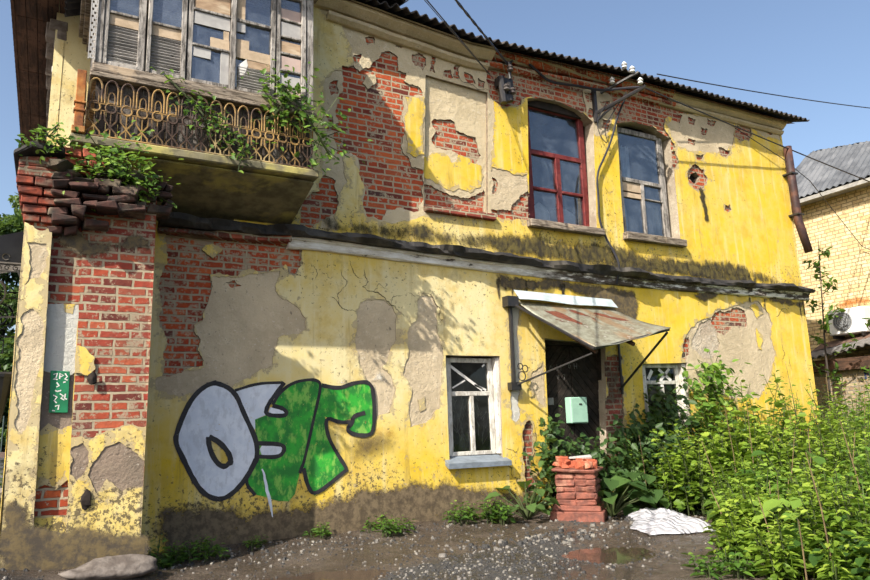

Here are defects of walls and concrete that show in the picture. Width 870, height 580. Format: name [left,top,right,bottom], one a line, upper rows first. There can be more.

flaking render [300,26,780,230]
damp [699,188,709,221]
flaking render [14,309,46,433]
flaking render [25,189,306,516]
flaking render [355,299,396,416]
crack [332,263,440,318]
flaking render [403,295,443,427]
damp [496,274,638,319]
rust [546,310,630,325]
flaking render [678,301,775,399]
damp [0,481,537,570]